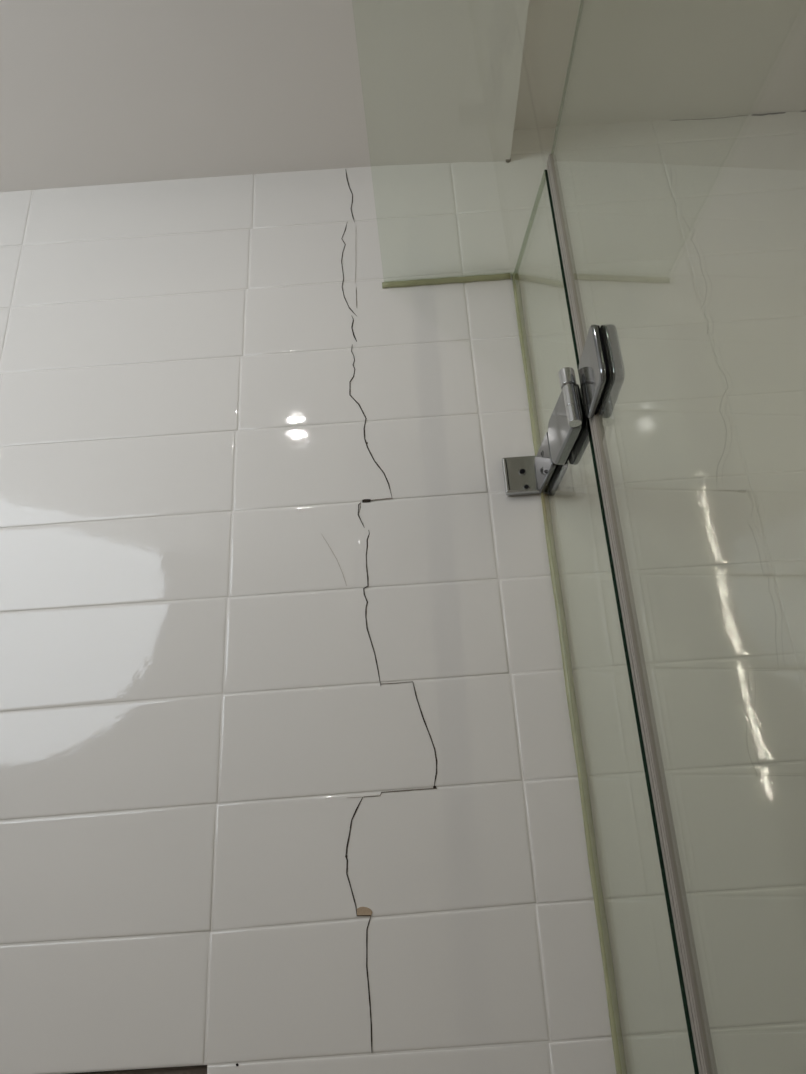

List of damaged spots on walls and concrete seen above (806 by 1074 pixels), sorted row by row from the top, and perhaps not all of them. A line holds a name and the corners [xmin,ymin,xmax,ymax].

peeling [357,907,372,915]
crack [322,172,437,1051]